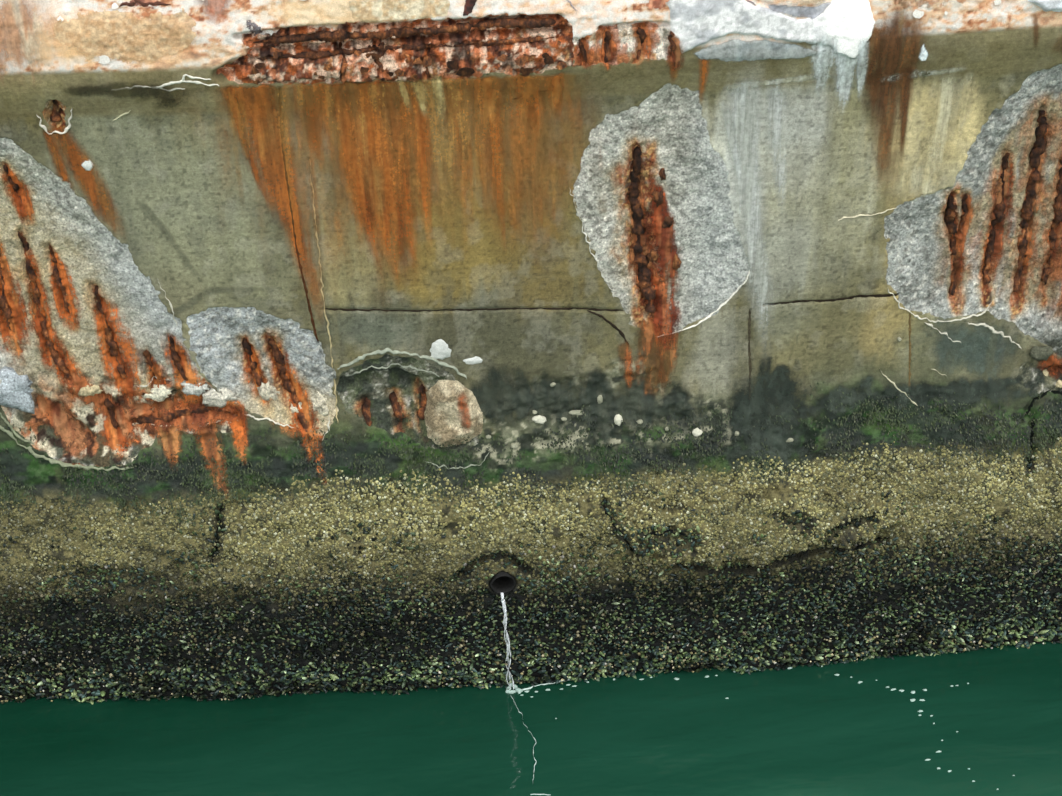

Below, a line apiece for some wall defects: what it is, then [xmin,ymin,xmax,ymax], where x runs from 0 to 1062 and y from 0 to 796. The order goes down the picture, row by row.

corrosion [44,125,116,226]
spalling [0,138,489,469]
corrosion [224,74,563,289]
spalling [216,0,683,85]
crack [278,88,629,421]
spalling [570,83,750,349]
damp [470,319,1037,483]
damp [724,36,867,302]
corrosion [866,11,921,168]
damp [888,68,971,155]
spalling [884,64,1062,394]
crack [601,502,692,552]